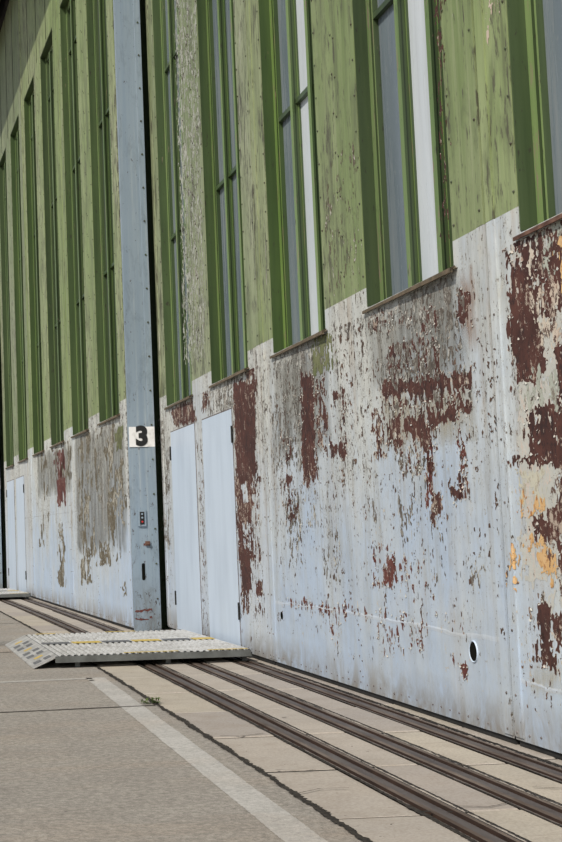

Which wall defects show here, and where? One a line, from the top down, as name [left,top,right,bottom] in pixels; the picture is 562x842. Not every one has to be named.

peeling [169,391,210,428]
peeling [231,220,562,707]